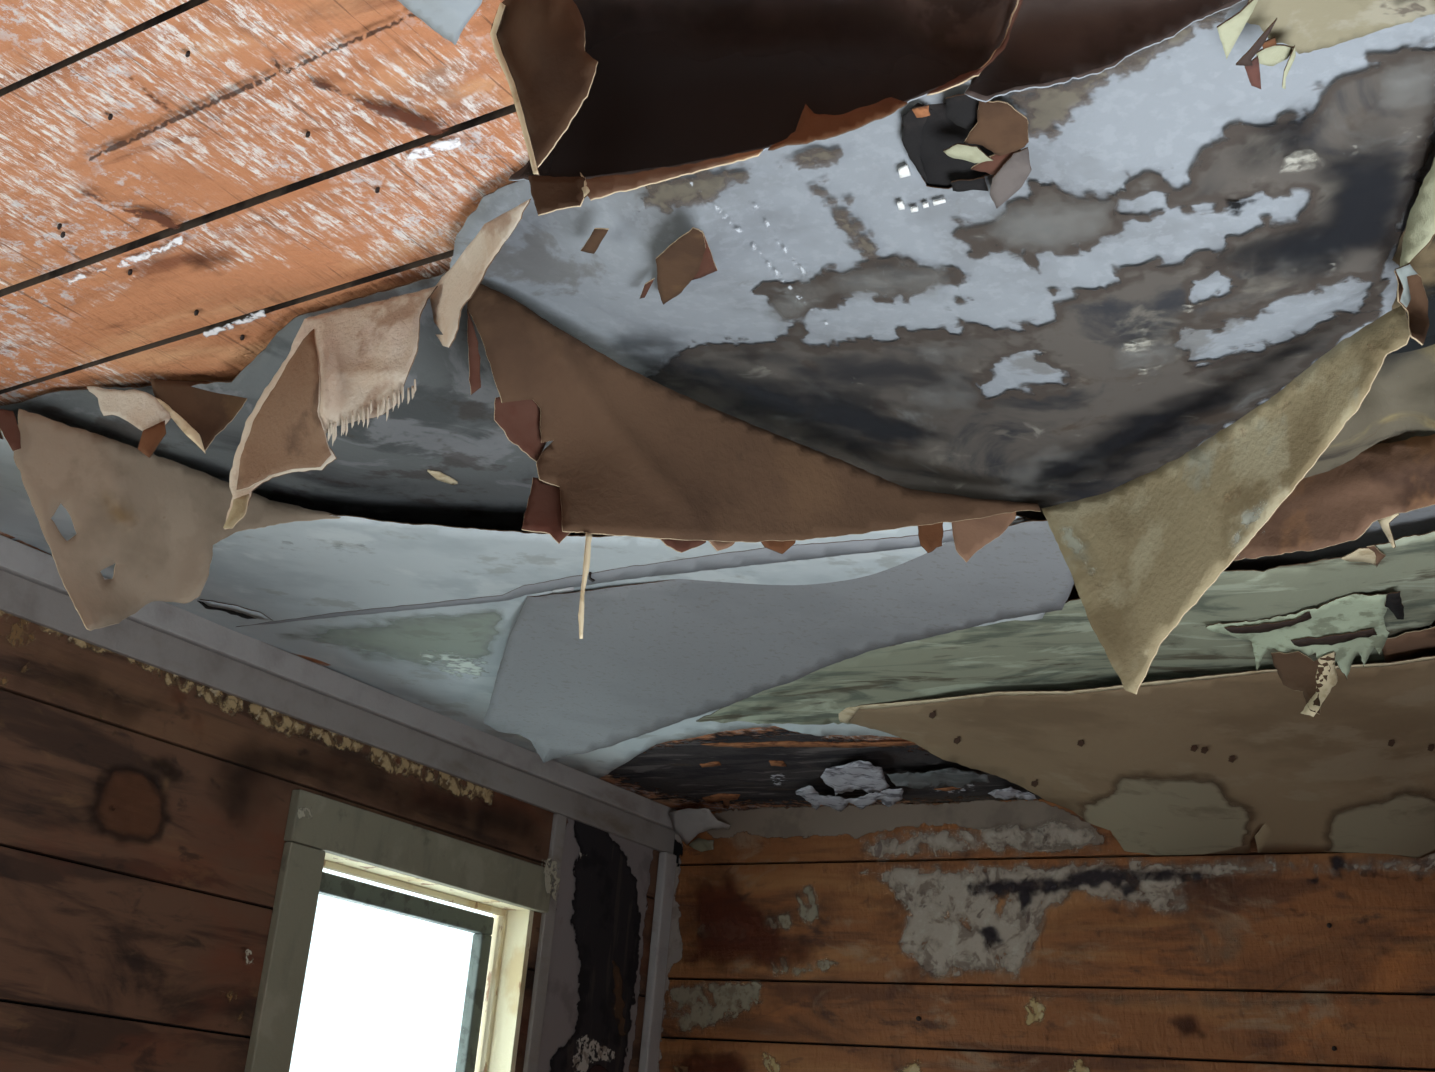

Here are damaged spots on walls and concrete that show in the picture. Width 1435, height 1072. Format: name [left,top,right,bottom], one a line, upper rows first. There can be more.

damp [1381,3,1426,14]
spalling [311,80,448,135]
damp [1011,8,1229,139]
flaking render [898,164,911,178]
flaking render [897,198,946,213]
damp [623,48,1435,520]
peeling [25,620,493,804]
damp [91,761,176,842]
peeling [541,820,641,1072]